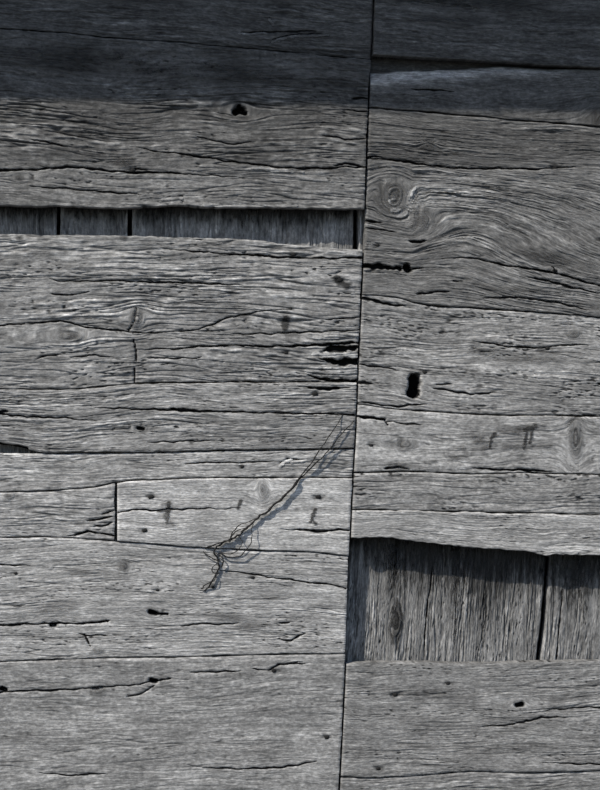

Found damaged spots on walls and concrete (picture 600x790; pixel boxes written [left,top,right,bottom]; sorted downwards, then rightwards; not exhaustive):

crack [346,97,368,112]
crack [0,135,574,195]
crack [0,278,495,425]
crack [0,620,110,646]
crack [182,621,237,629]
crack [279,622,306,642]
crack [191,661,305,673]
crack [0,678,171,697]